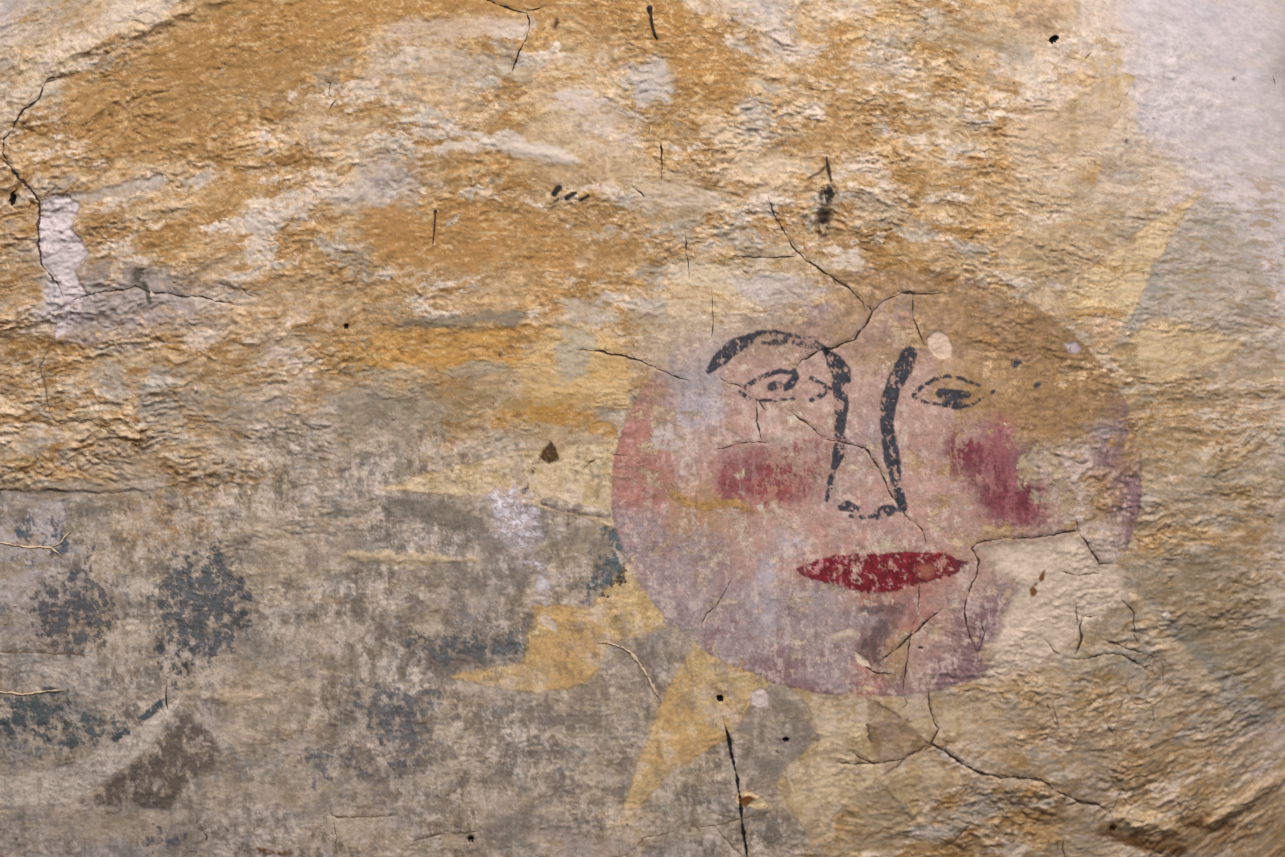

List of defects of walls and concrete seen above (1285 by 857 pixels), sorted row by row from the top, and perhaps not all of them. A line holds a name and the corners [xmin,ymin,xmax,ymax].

crack [487,0,541,71]
spalling [39,175,192,343]
crack [2,77,256,305]
crack [732,197,937,368]
crack [577,349,689,381]
crack [718,378,927,544]
crack [598,642,660,698]
crack [840,521,1120,815]
crack [1043,598,1172,736]
crack [330,808,392,845]
crack [614,719,769,857]
crack [938,817,979,852]